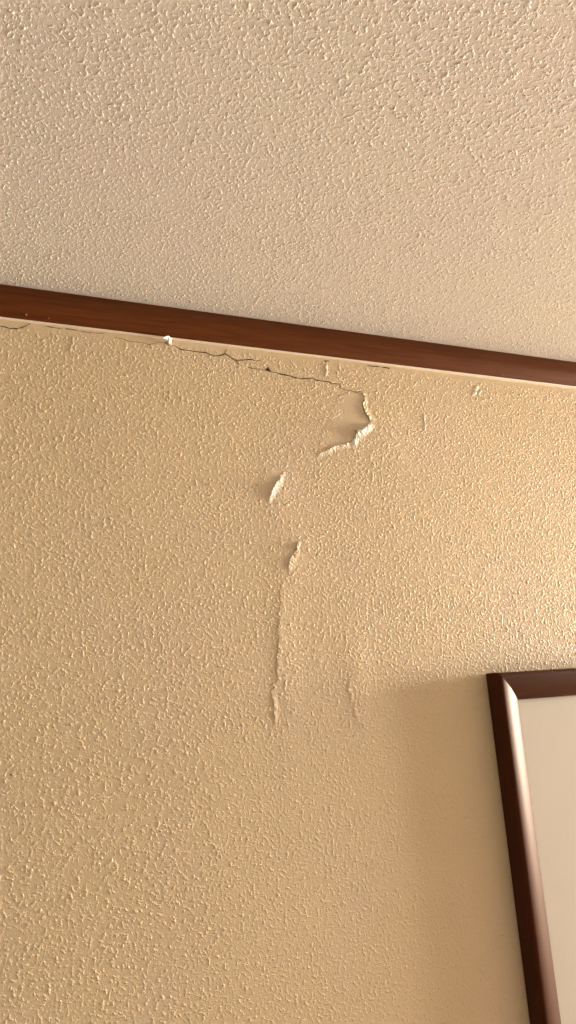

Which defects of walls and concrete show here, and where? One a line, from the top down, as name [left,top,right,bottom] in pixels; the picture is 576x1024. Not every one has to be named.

crack [120,338,360,393]
peeling [316,390,378,461]